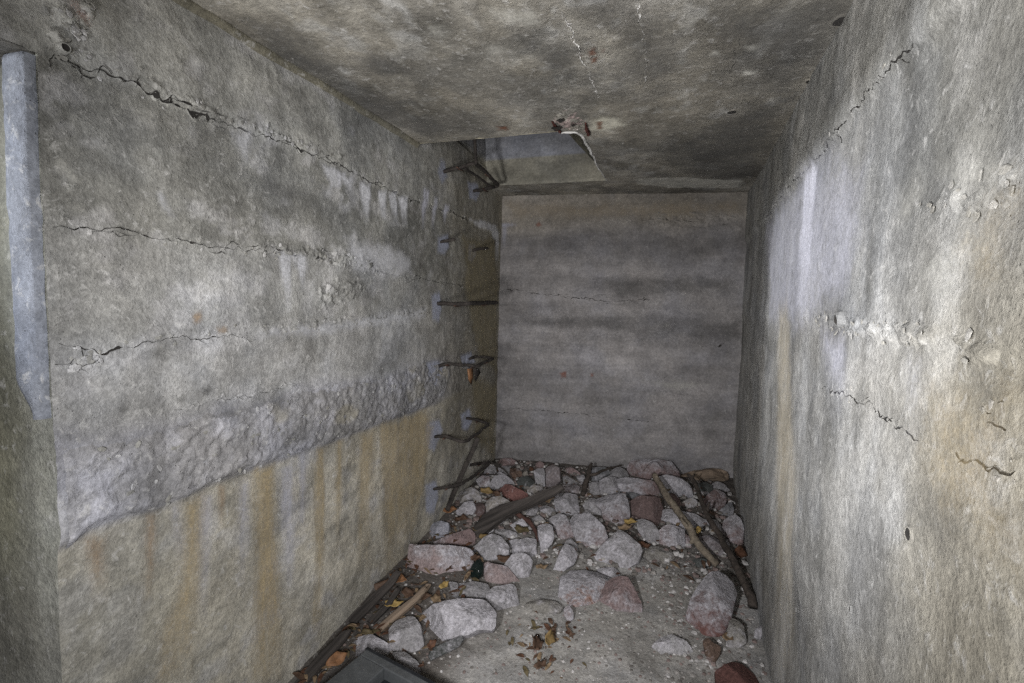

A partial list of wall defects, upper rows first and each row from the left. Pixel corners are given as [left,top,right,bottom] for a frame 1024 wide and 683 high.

crack [48,54,469,222]
spalling [551,108,607,181]
crack [766,43,914,219]
crack [57,219,648,305]
crack [55,331,254,374]
crack [822,386,918,441]
crack [955,452,1016,485]